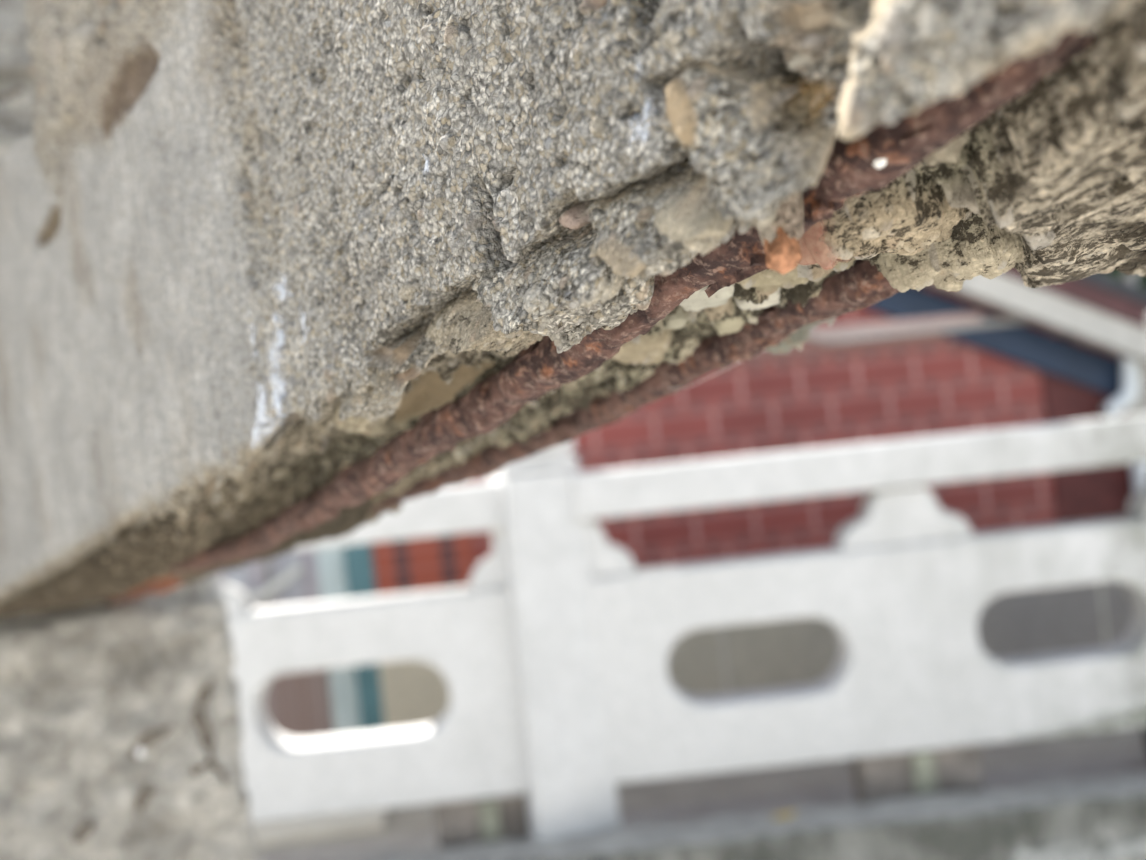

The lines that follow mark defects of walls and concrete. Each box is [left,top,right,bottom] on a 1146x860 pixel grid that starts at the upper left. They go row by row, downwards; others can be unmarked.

corrosion [106,27,1098,605]
spalling [102,0,1146,603]